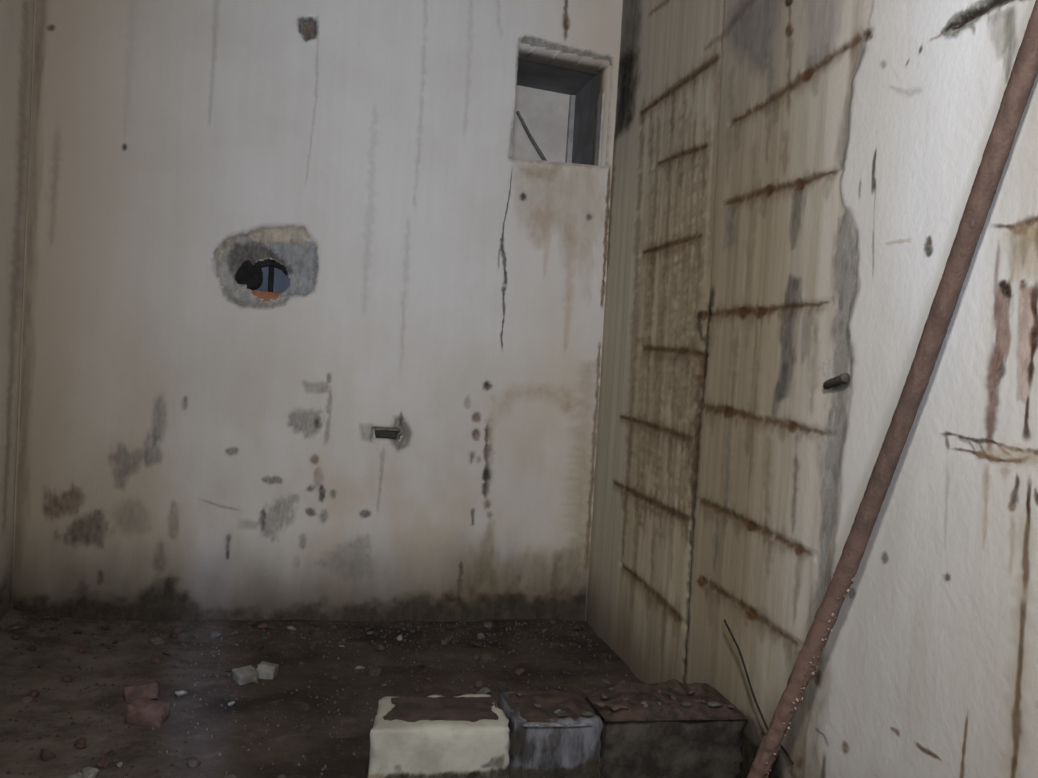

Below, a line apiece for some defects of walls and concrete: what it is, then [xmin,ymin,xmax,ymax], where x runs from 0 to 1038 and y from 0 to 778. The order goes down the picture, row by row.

spalling [942,0,1013,37]
corrosion [641,58,717,114]
corrosion [756,30,872,109]
corrosion [728,171,833,203]
corrosion [998,217,1038,232]
spalling [215,226,318,307]
crack [500,174,512,347]
corrosion [702,501,804,554]
corrosion [1010,477,1038,587]
leakage [12,578,258,622]
leakage [273,594,586,622]
corrosion [1011,605,1025,778]